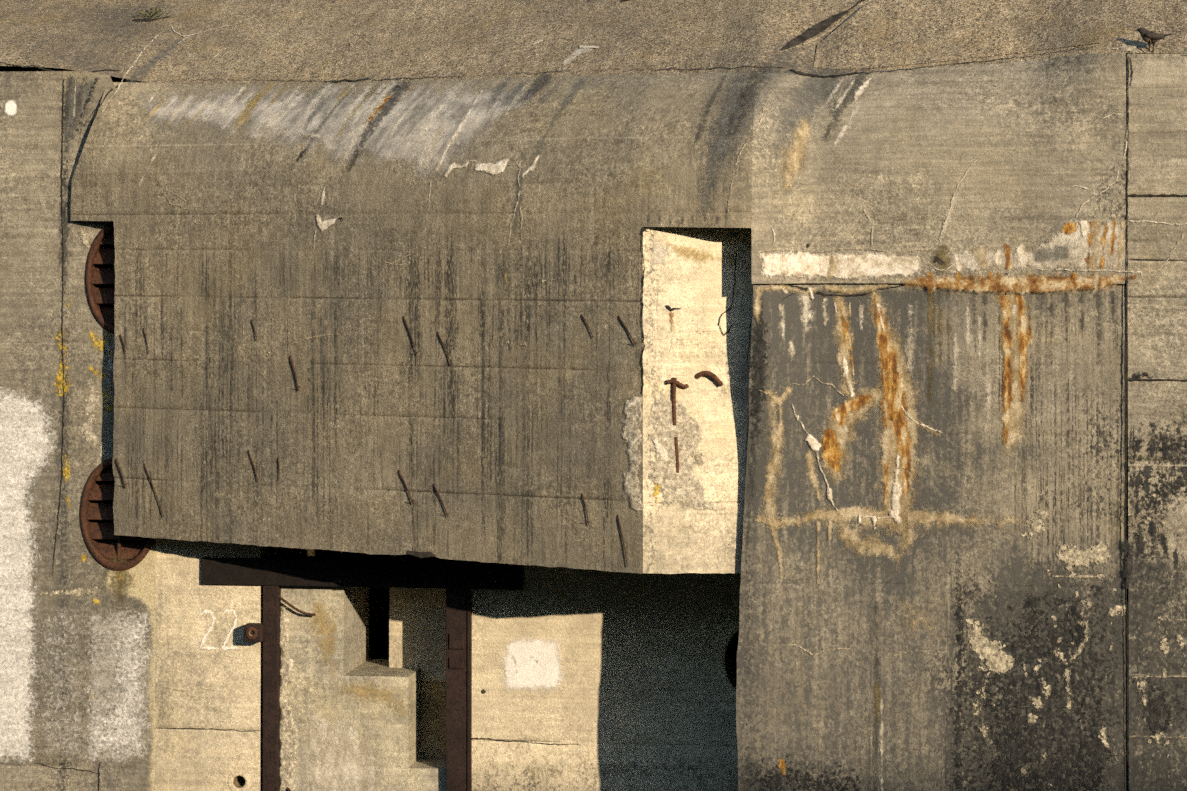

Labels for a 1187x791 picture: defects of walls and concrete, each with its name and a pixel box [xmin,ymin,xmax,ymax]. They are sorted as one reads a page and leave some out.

water stain [137,73,552,176]
water stain [563,45,599,65]
spalling [622,371,723,511]
rust [763,395,783,525]
rust [822,292,942,535]
rust [903,246,1142,454]
water stain [1128,372,1187,381]
water stain [946,421,1187,791]